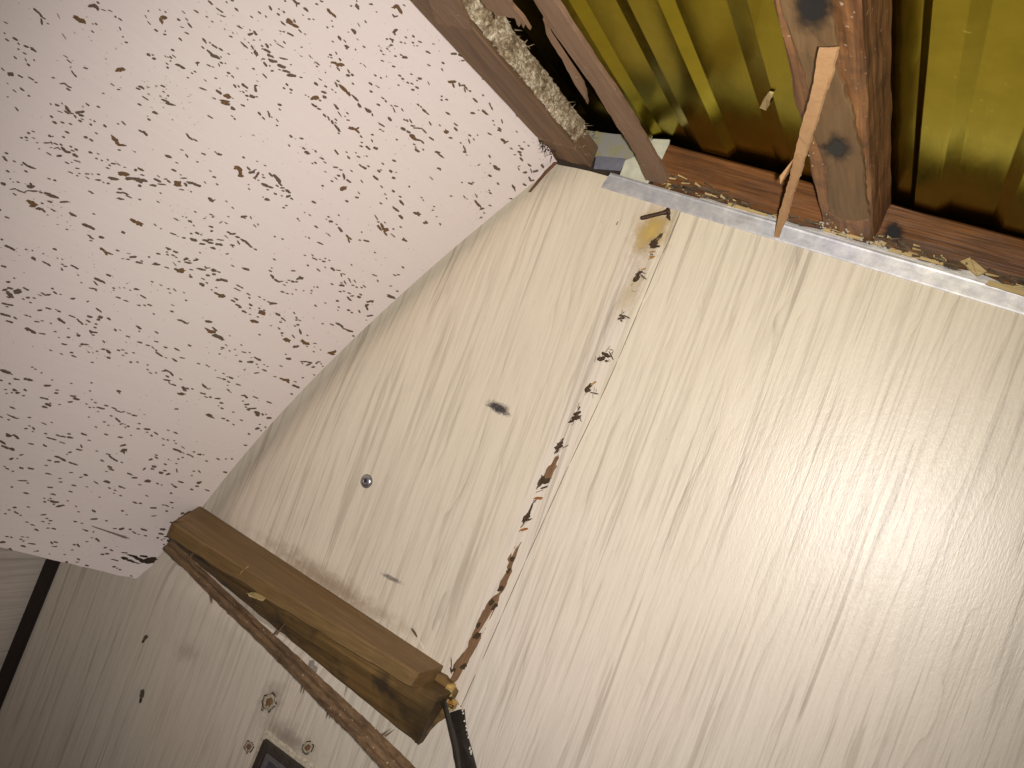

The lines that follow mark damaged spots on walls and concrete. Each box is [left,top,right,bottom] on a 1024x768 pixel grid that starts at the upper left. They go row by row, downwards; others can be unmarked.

crack [461,213,680,706]
damp [638,217,666,250]